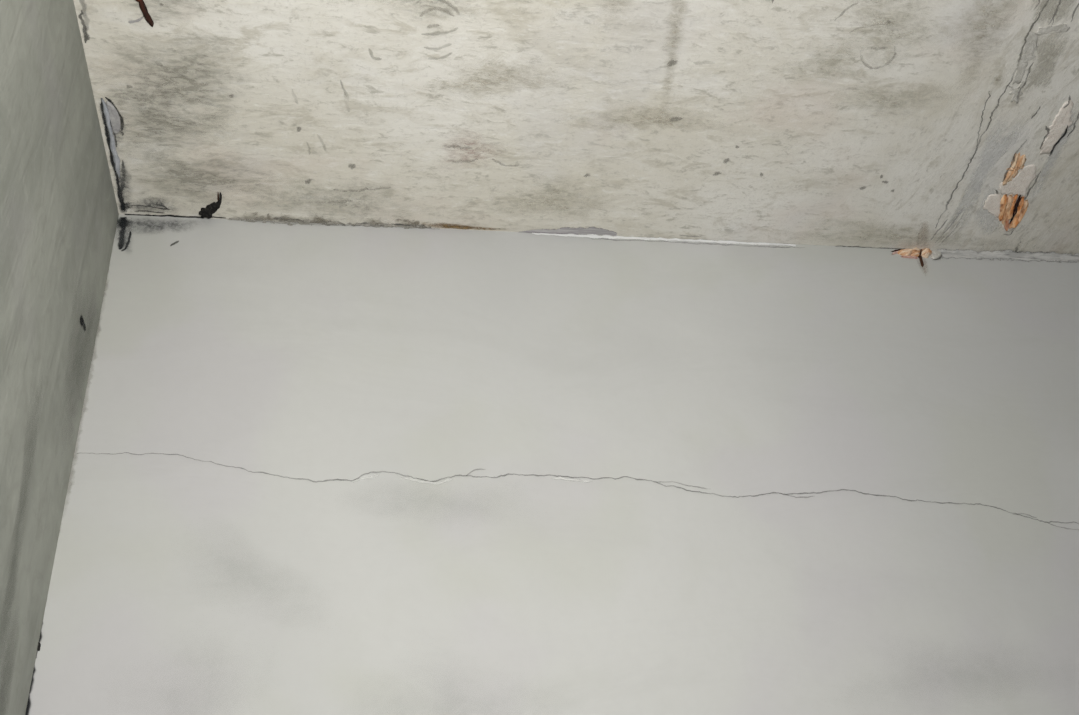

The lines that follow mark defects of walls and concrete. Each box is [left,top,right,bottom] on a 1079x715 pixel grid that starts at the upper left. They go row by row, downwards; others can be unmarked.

water stain [156,55,210,102]
crack [934,0,1049,243]
spalling [979,96,1075,235]
crack [551,474,642,482]